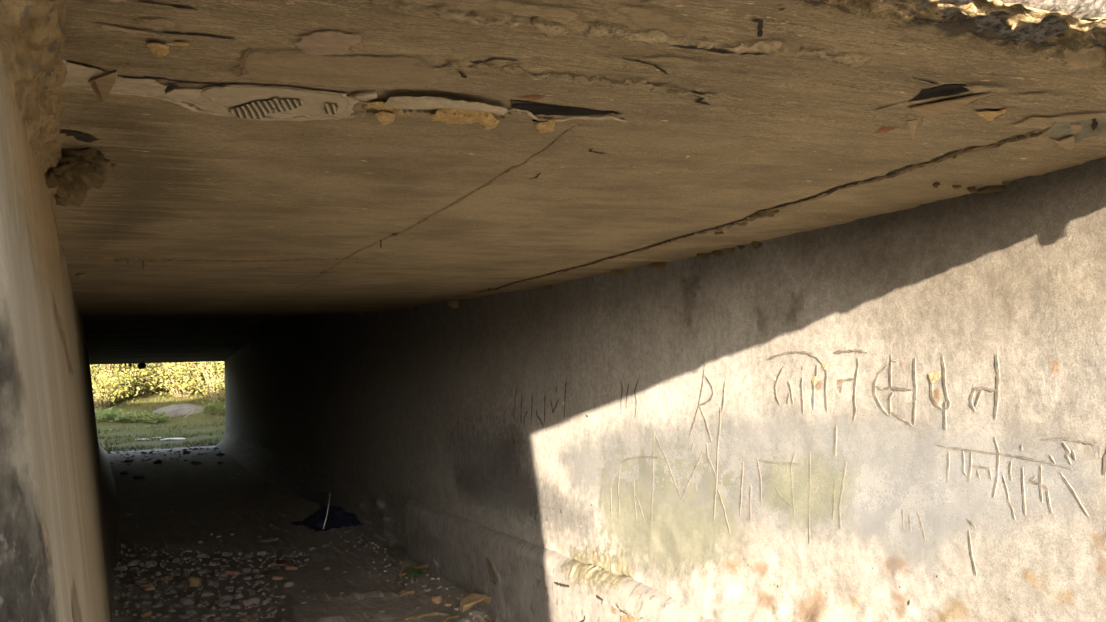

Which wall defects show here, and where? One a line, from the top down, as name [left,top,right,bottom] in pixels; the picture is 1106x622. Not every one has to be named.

spalling [584,7,872,68]
peeling [1058,35,1106,69]
peeling [0,0,633,222]
peeling [975,110,1006,123]
spalling [1013,114,1106,150]
crack [477,124,1054,294]